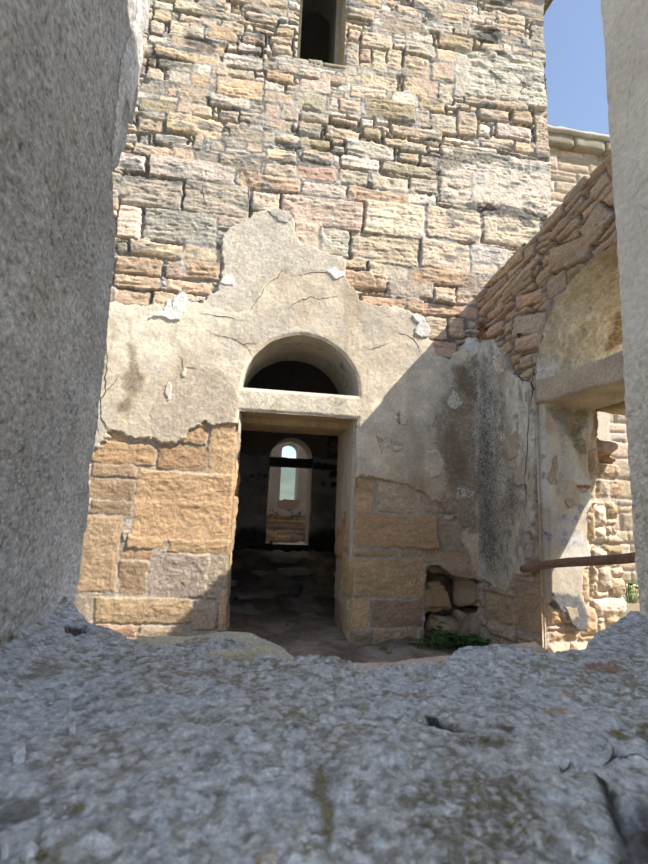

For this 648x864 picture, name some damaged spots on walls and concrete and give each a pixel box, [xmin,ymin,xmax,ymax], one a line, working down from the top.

peeling [208,208,345,311]
peeling [148,292,187,321]
crack [188,270,327,353]
peeling [412,315,430,338]
leakage [120,354,144,410]
peeling [444,373,462,409]
spalling [64,367,239,639]
peeling [425,449,445,479]
leakage [436,357,518,568]
spalling [350,475,483,646]